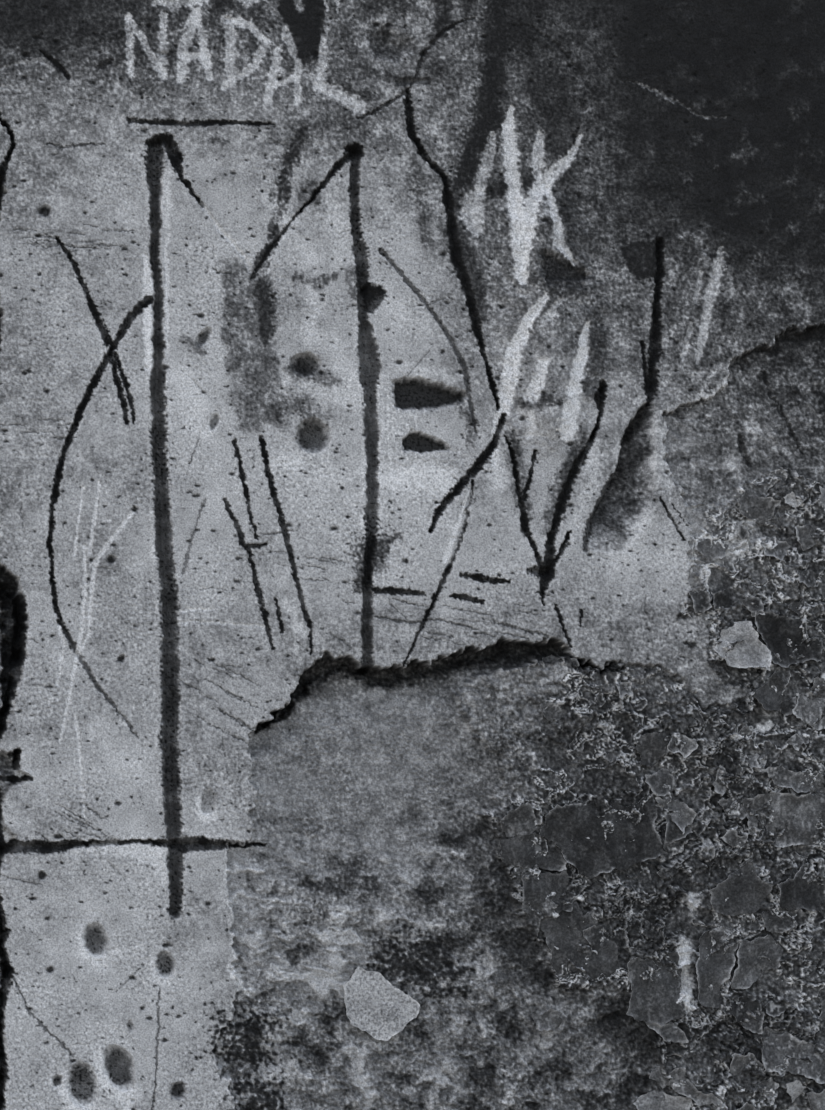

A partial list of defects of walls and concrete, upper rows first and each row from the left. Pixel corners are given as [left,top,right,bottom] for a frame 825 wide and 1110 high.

crack [761,367,805,455]
spalling [0,566,22,726]
peeling [227,322,825,1110]
spalling [0,752,30,806]
spalling [1,820,16,869]